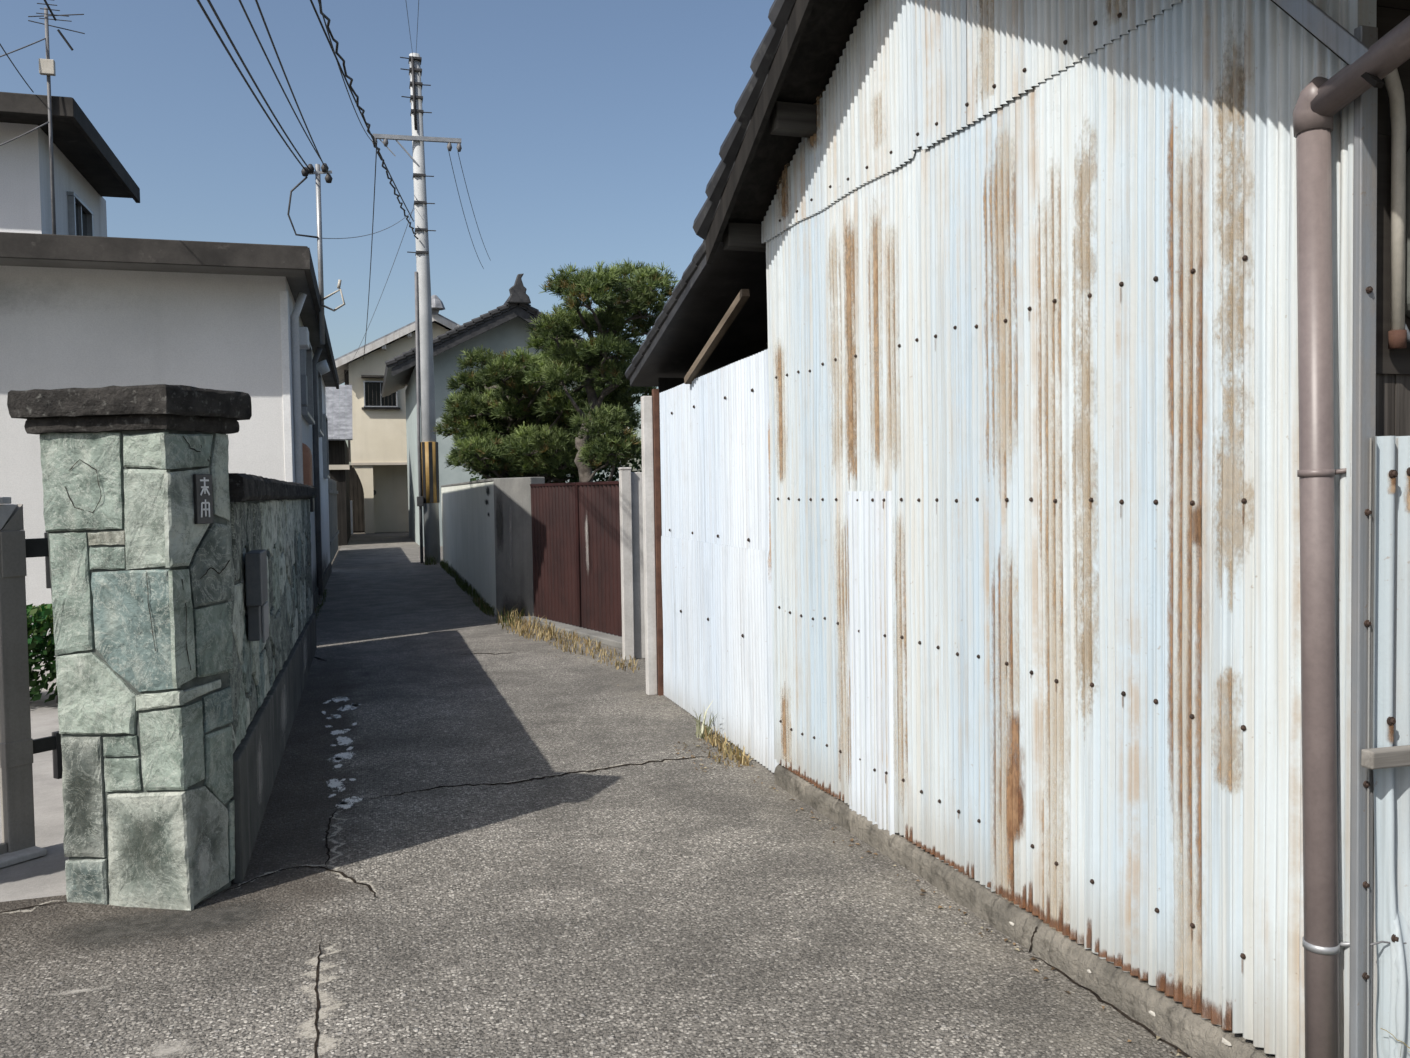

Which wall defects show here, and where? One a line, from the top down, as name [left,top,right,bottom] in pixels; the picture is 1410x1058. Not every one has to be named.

rust [832,224,897,476]
rust [1390,475,1410,510]
rust [780,527,851,801]
rust [896,539,907,680]
rust [905,106,1232,1032]
rust [885,699,908,786]
crack [224,756,719,898]
crack [297,938,343,1058]
crack [1029,926,1192,1058]